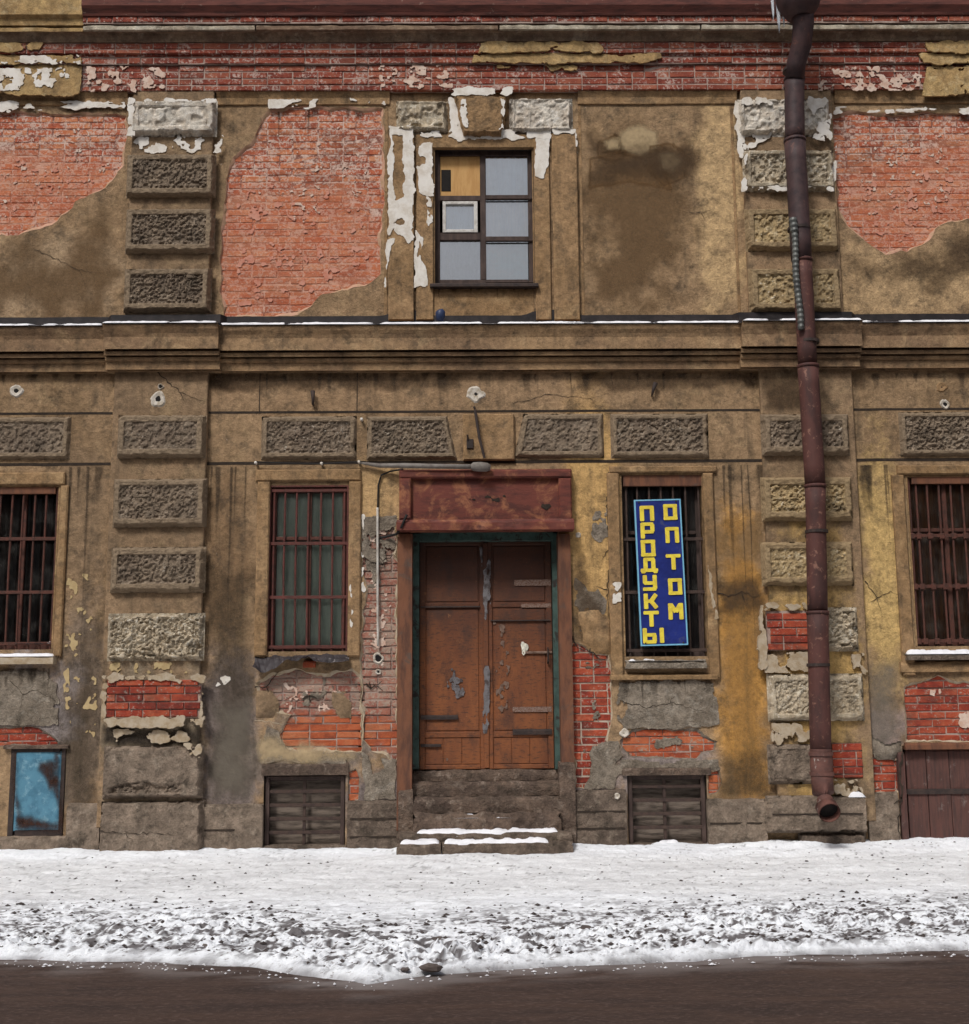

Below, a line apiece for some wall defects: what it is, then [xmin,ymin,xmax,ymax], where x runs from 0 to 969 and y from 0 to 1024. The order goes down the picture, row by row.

flaking render [472,40,662,72]
flaking render [0,42,578,316]
damp [583,125,692,296]
peeling [733,97,773,165]
flaking render [807,40,969,255]
flaking render [255,514,397,801]
flaking render [756,602,808,673]
flaking render [0,662,231,758]
flaking render [572,629,722,799]
spalling [770,723,810,745]
flaking render [831,743,898,797]
flaking render [904,675,969,742]